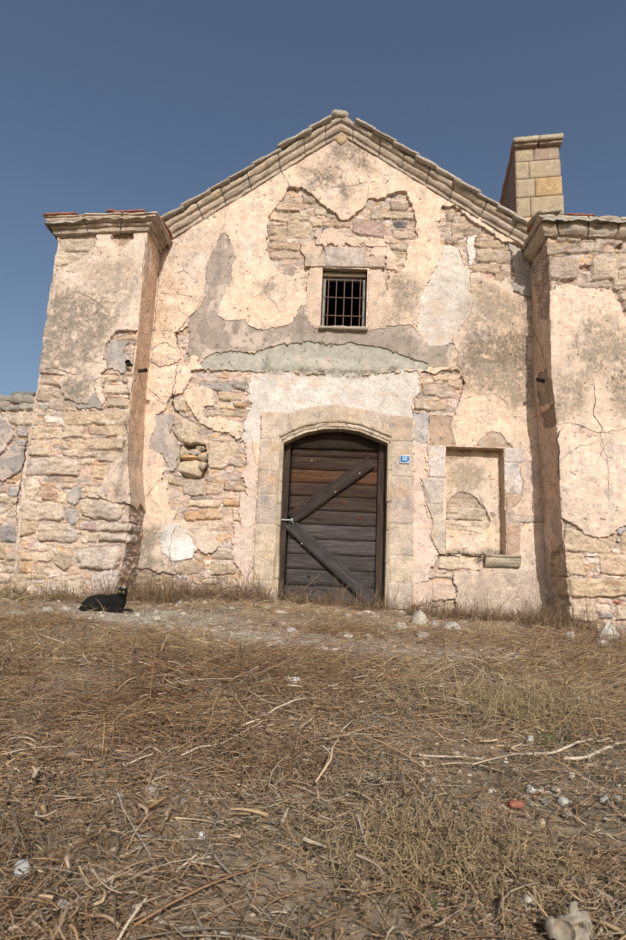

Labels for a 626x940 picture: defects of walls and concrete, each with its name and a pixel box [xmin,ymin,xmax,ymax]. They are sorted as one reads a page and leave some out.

crack [142,212,226,423]
spalling [0,207,626,615]
spalling [266,188,418,292]
crack [447,311,626,498]
spalling [551,519,626,632]